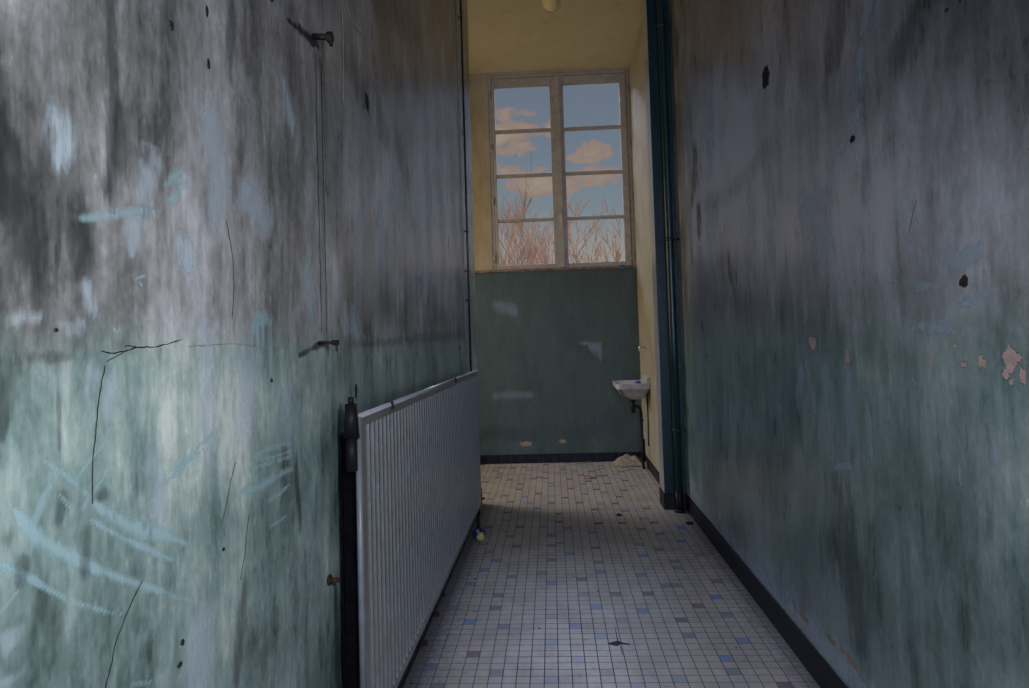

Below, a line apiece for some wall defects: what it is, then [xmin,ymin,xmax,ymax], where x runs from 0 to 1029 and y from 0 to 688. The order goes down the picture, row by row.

peeling [1002,343,1029,387]